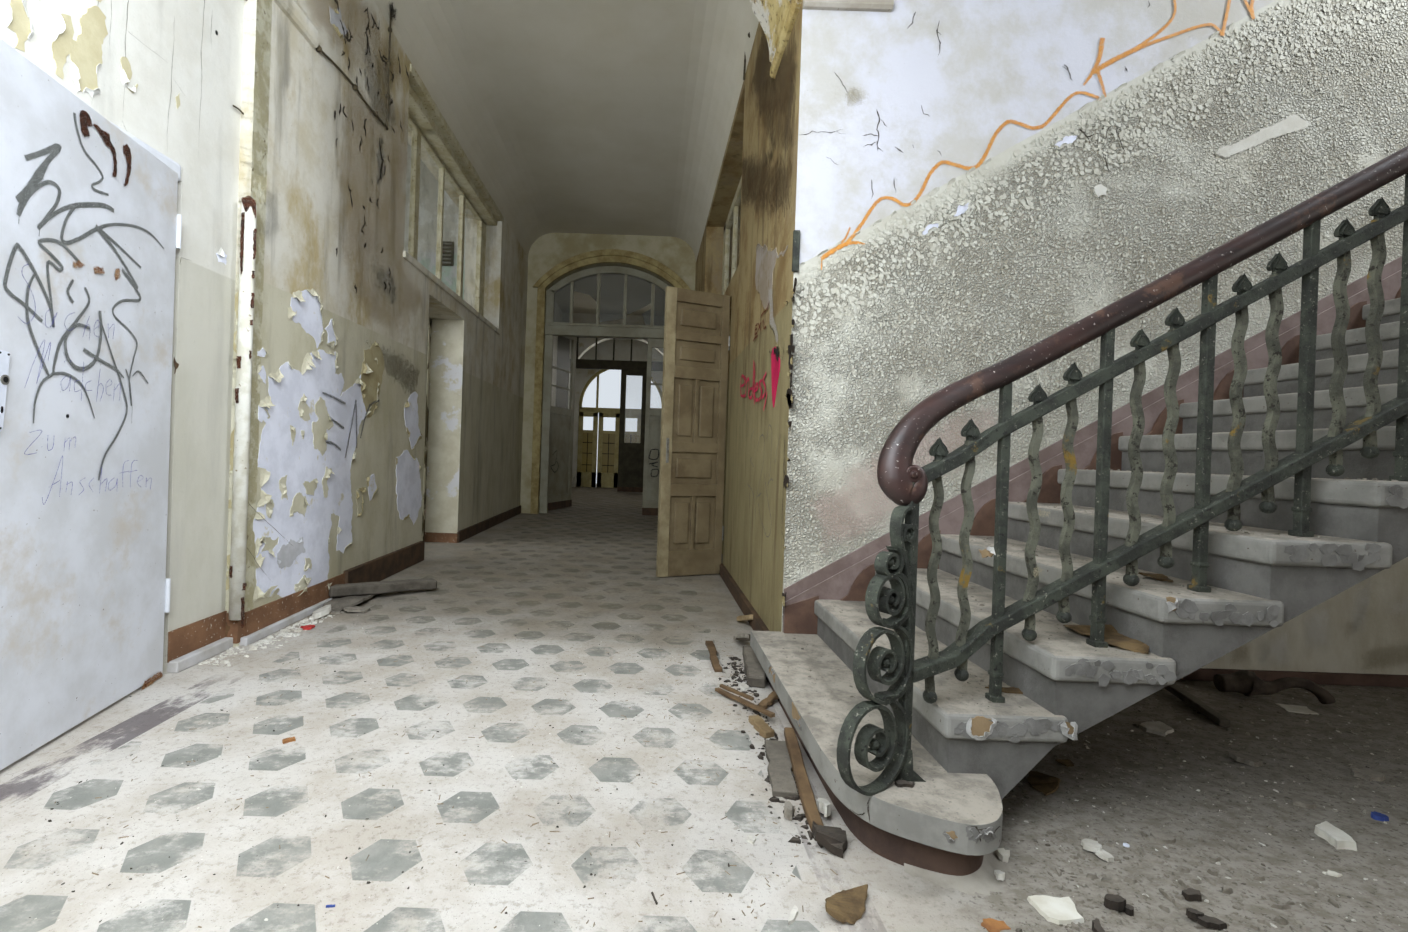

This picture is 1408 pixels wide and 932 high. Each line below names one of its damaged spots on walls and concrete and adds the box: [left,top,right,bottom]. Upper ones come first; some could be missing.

peeling [3,0,34,52]
peeling [51,0,108,98]
peeling [120,57,138,93]
crack [801,109,942,199]
crack [1078,126,1125,171]
peeling [755,0,1408,607]
peeling [253,289,385,603]
peeling [395,391,422,525]